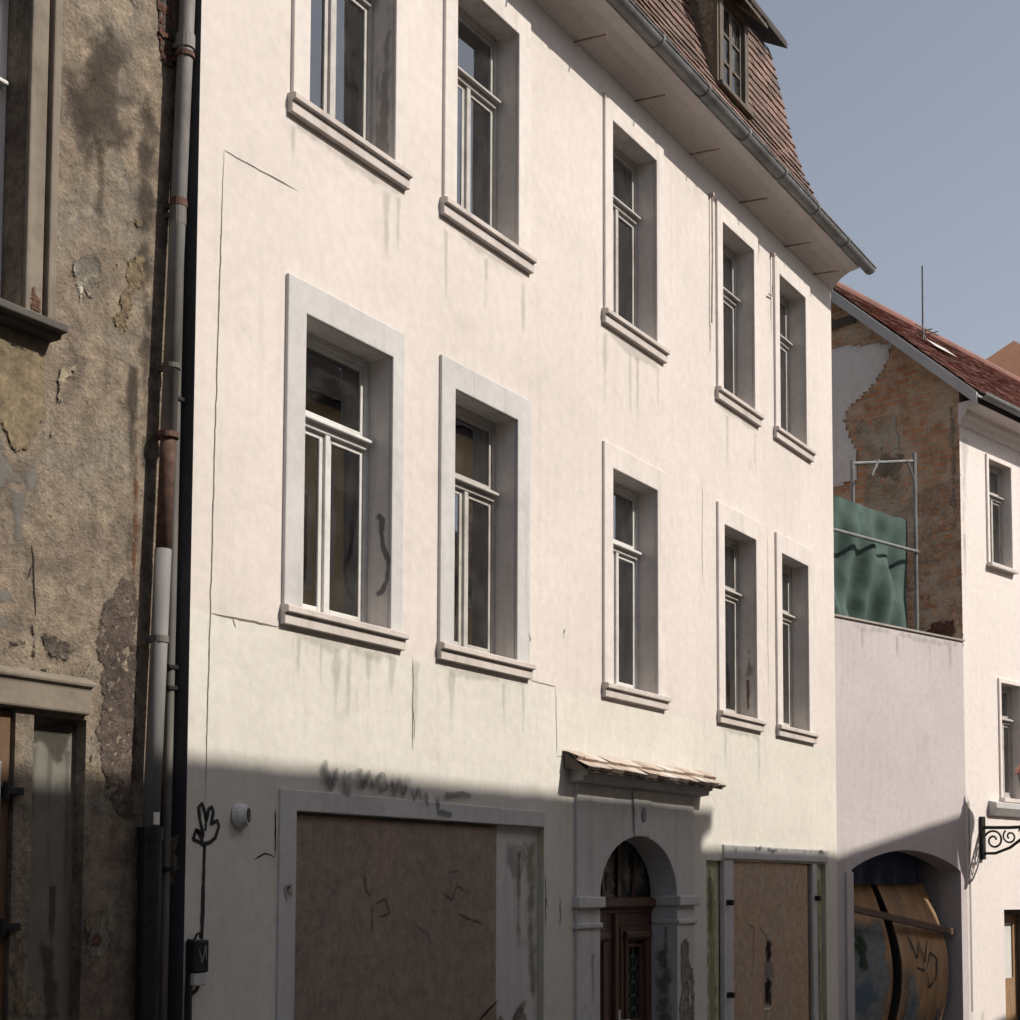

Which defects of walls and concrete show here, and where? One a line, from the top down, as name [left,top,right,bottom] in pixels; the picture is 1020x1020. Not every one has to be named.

spalling [157,0,173,69]
spalling [114,253,147,331]
peeling [0,337,77,452]
crack [205,150,298,802]
spalling [831,342,964,647]
spalling [82,577,140,820]
crack [254,811,276,860]
spalling [498,999,526,1020]
peeling [680,938,695,1020]